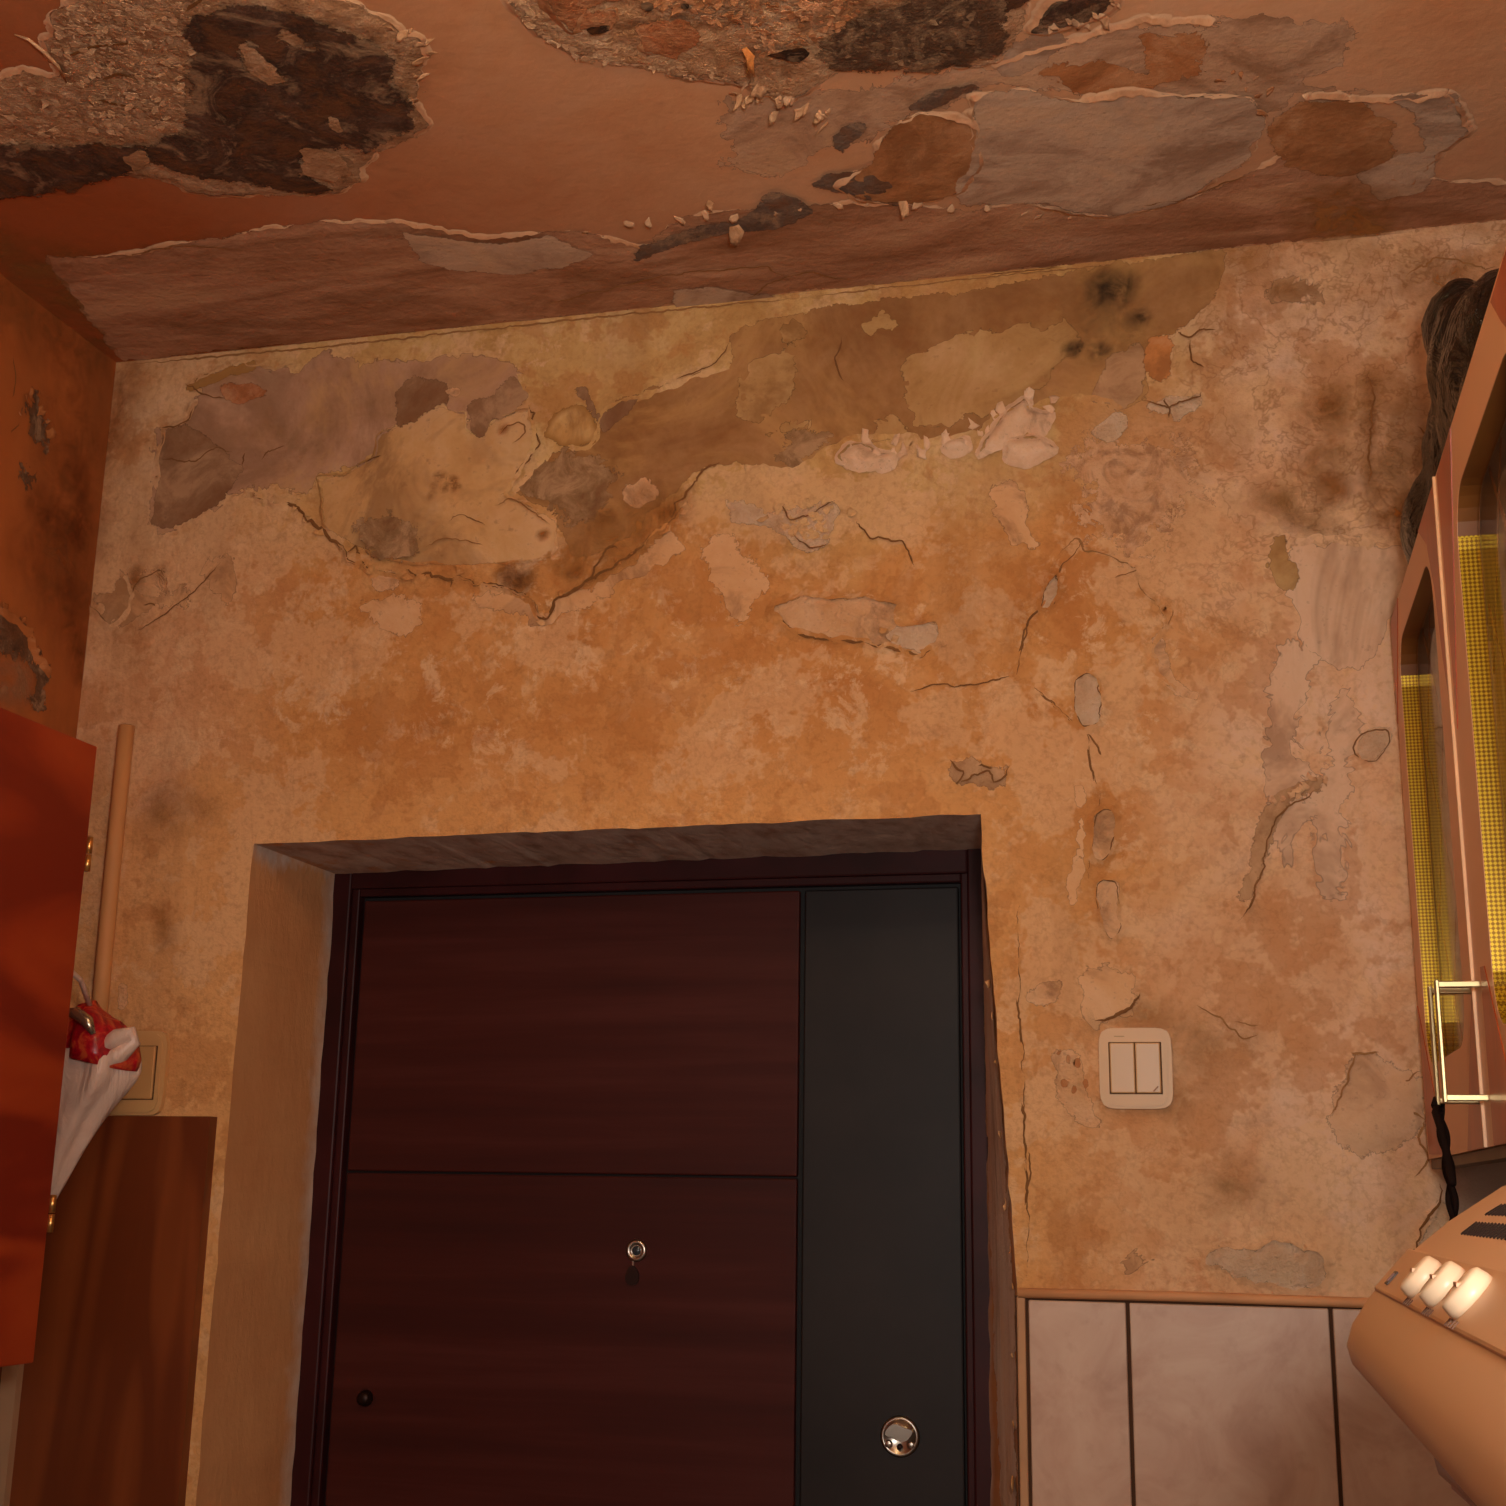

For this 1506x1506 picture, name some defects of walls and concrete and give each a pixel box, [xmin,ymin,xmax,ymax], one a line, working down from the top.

peeling [0,0,1506,665]
crack [503,407,541,494]
crack [243,462,720,620]
flaking render [0,602,52,713]
peeling [948,756,1009,790]
crack [912,537,1176,879]
peeling [1237,508,1408,913]
crack [1010,905,1032,1276]
flaking render [1391,1186,1467,1265]